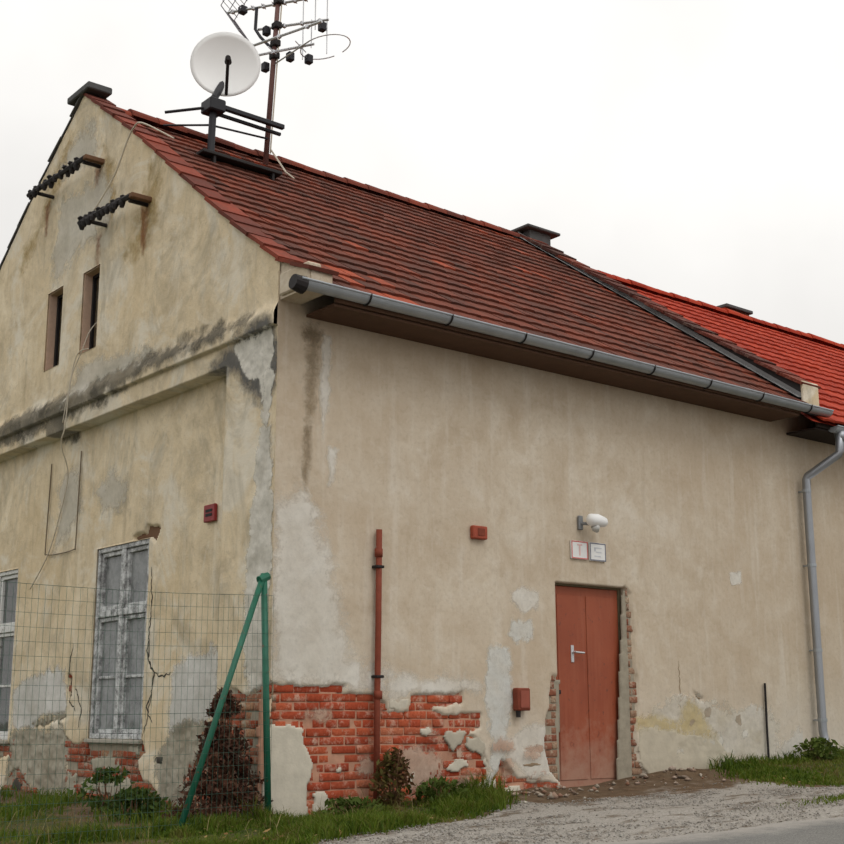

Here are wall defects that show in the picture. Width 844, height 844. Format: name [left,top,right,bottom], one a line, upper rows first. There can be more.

peeling [51,175,111,278]
water stain [0,316,277,447]
water stain [303,327,331,424]
crack [69,649,82,727]
crack [142,567,171,736]
spalling [0,325,560,818]
water stain [271,492,513,782]